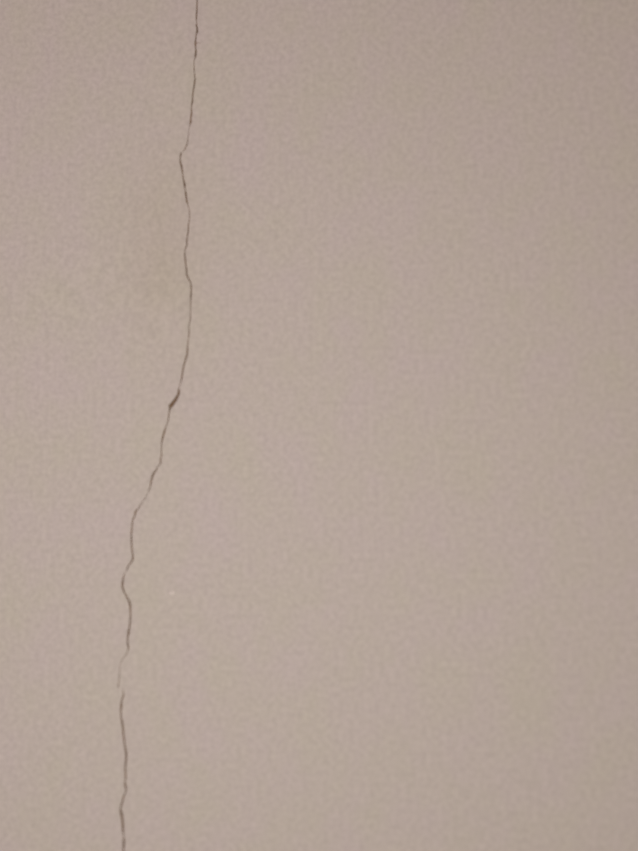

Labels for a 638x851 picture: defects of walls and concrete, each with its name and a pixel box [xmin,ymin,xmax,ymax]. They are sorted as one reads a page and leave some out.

crack [118,1,202,851]